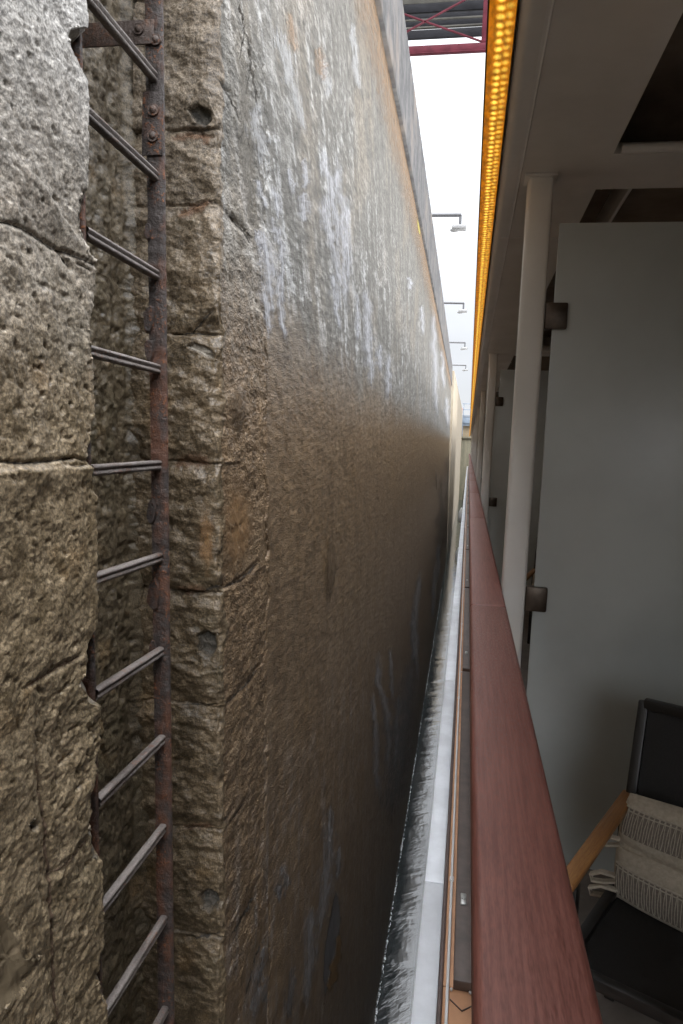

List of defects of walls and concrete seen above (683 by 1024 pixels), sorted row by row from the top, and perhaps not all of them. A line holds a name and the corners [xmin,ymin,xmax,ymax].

damp [255,180,286,334]
damp [288,152,392,394]
damp [360,0,451,424]